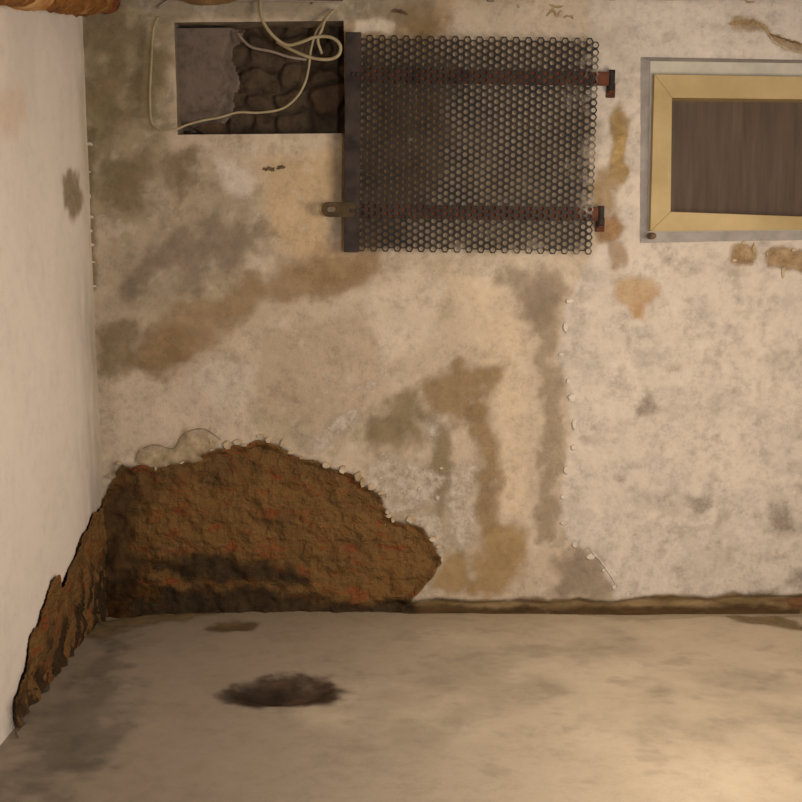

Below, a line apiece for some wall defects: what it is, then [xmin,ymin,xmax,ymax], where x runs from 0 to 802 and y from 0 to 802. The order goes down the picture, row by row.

damp [64,170,82,217]
damp [100,253,377,373]
flaking render [730,241,756,264]
flaking render [766,248,802,279]
damp [368,360,524,595]
flaking render [13,434,802,728]